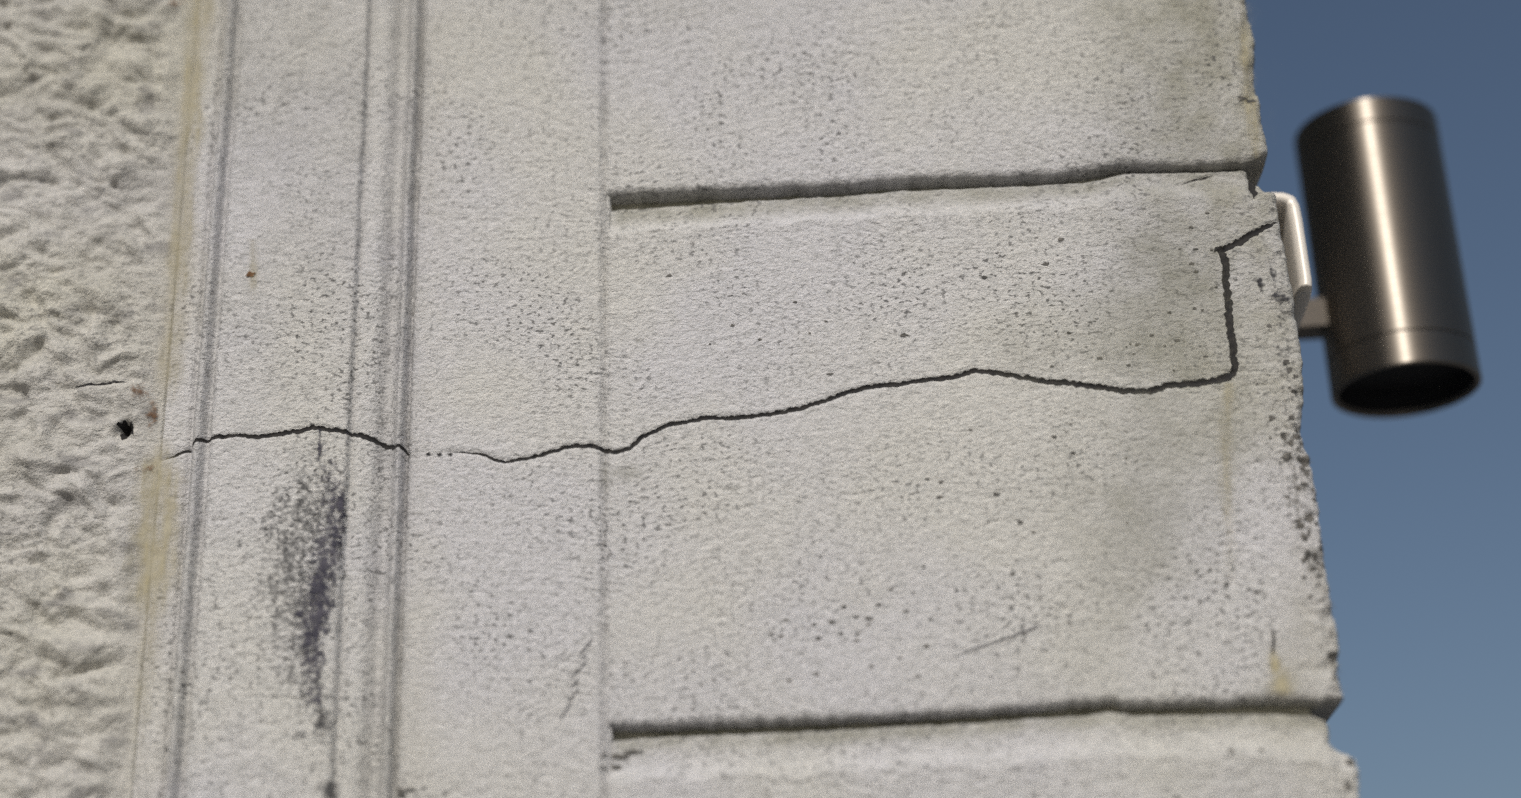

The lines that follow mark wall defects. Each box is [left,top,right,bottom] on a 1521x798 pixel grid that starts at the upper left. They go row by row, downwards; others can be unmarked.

crack [166,182,1278,463]
leakage [268,429,346,738]
leakage [317,782,337,798]